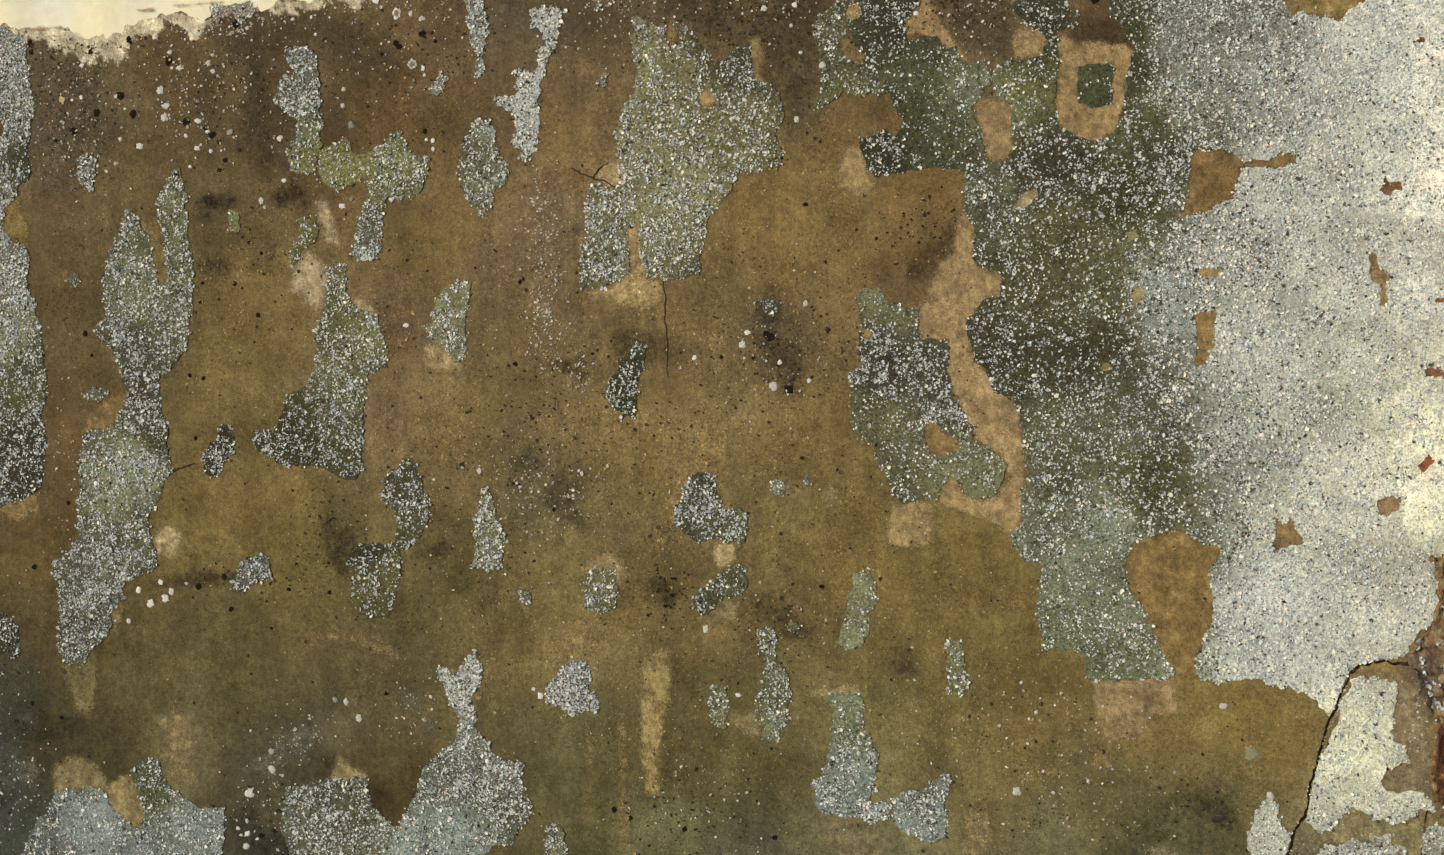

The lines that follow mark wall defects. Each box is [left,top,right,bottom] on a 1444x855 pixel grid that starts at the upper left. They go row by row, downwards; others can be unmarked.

peeling [0,0,362,521]
peeling [252,45,431,480]
peeling [578,16,786,310]
peeling [50,167,196,719]
peeling [229,553,274,594]
peeling [346,459,432,619]
peeling [810,0,1444,855]
peeling [280,649,532,855]
peeling [544,823,568,855]
peeling [707,622,803,743]
crack [1286,660,1424,855]
corrosion [1434,725,1444,789]